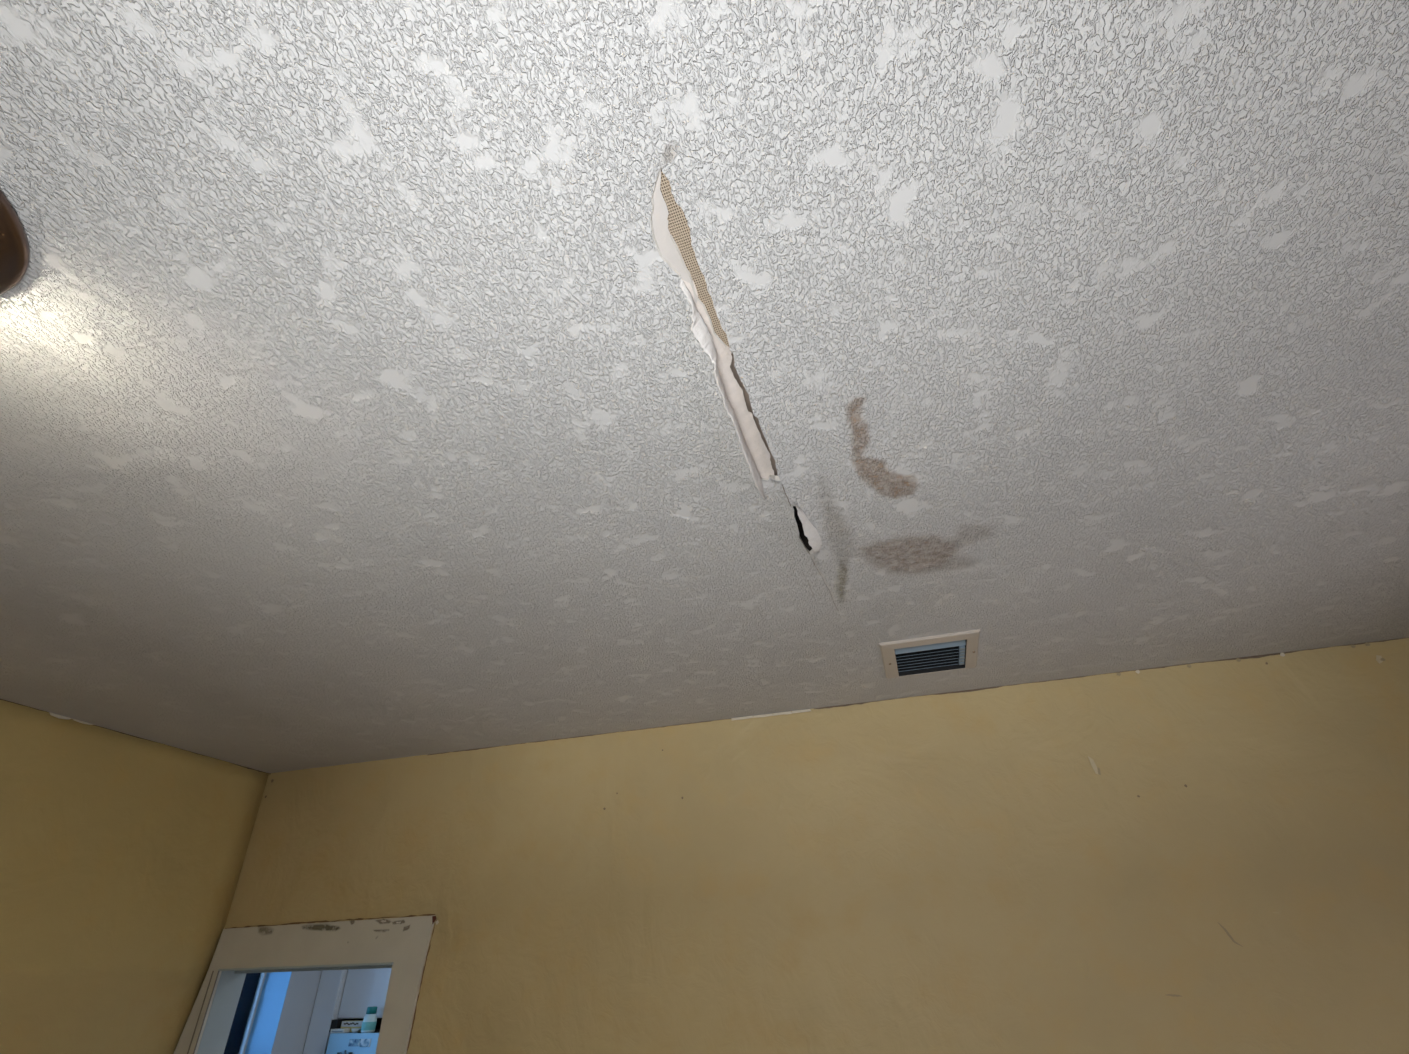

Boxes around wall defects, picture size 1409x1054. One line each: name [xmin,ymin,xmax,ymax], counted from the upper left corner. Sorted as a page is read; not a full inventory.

spalling [793,506,821,551]